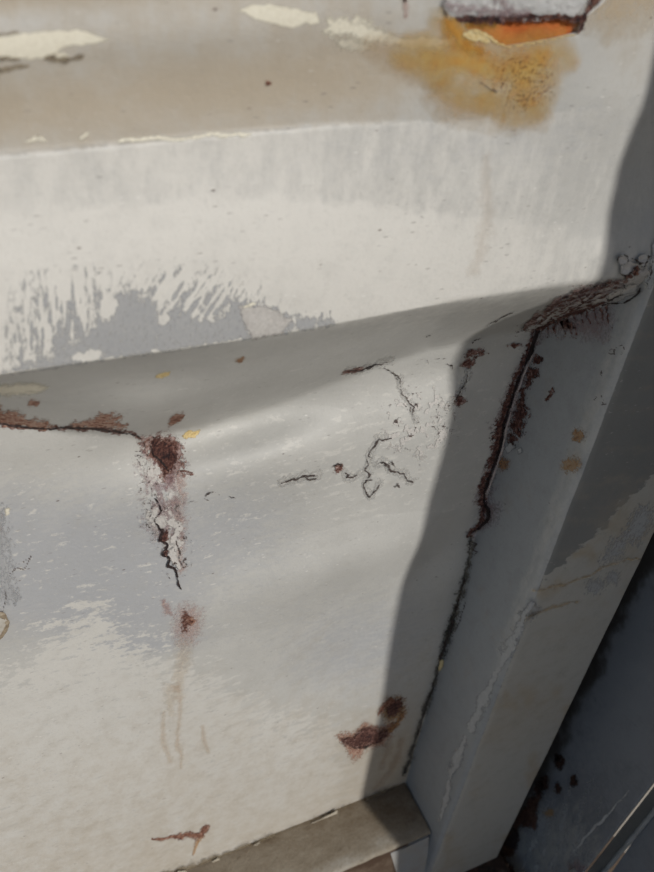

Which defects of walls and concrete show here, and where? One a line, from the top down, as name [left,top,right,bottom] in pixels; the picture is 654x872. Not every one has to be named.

peeling [0,29,109,73]
peeling [239,4,450,52]
peeling [463,29,578,47]
corrosion [393,0,654,122]
peeling [1,267,335,375]
crack [0,399,142,440]
crack [342,357,419,423]
corrosion [466,254,650,538]
crack [278,433,415,499]
crack [402,536,478,776]
corrosion [334,696,406,763]
corrosion [499,753,578,872]